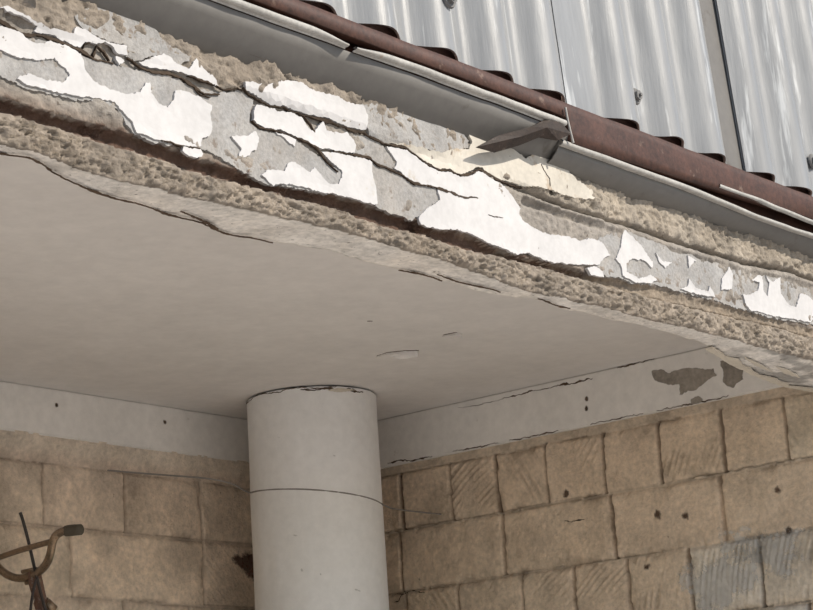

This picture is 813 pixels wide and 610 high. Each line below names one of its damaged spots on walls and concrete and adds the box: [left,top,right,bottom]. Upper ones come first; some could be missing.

crack [0,19,522,218]
crack [0,152,273,243]
corrosion [0,97,494,255]
peeling [0,6,813,326]
corrosion [505,255,582,279]
crack [458,378,592,408]
peeling [652,361,743,404]
leakage [232,553,254,579]